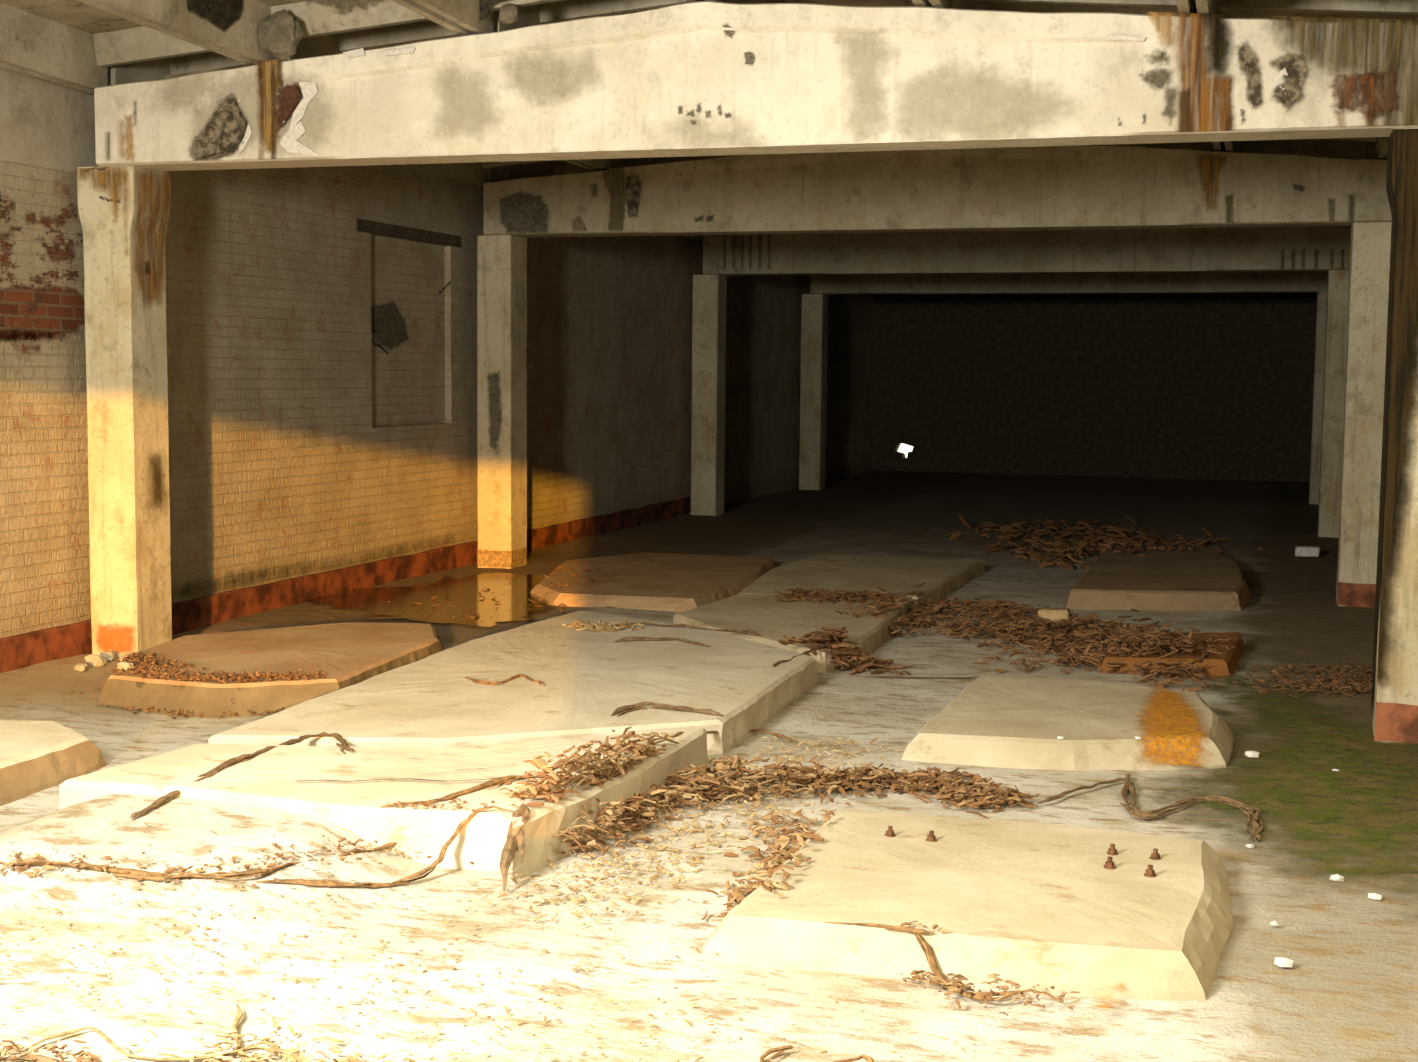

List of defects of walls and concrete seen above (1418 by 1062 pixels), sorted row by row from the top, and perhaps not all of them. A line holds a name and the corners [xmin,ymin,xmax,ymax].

spalling [187,0,244,32]
spalling [257,9,304,60]
spalling [190,94,252,161]
corrosion [258,60,281,159]
corrosion [1150,12,1232,132]
spalling [1238,43,1308,110]
peeling [0,193,85,351]
flaking render [371,302,408,349]
water stain [1272,16,1418,720]